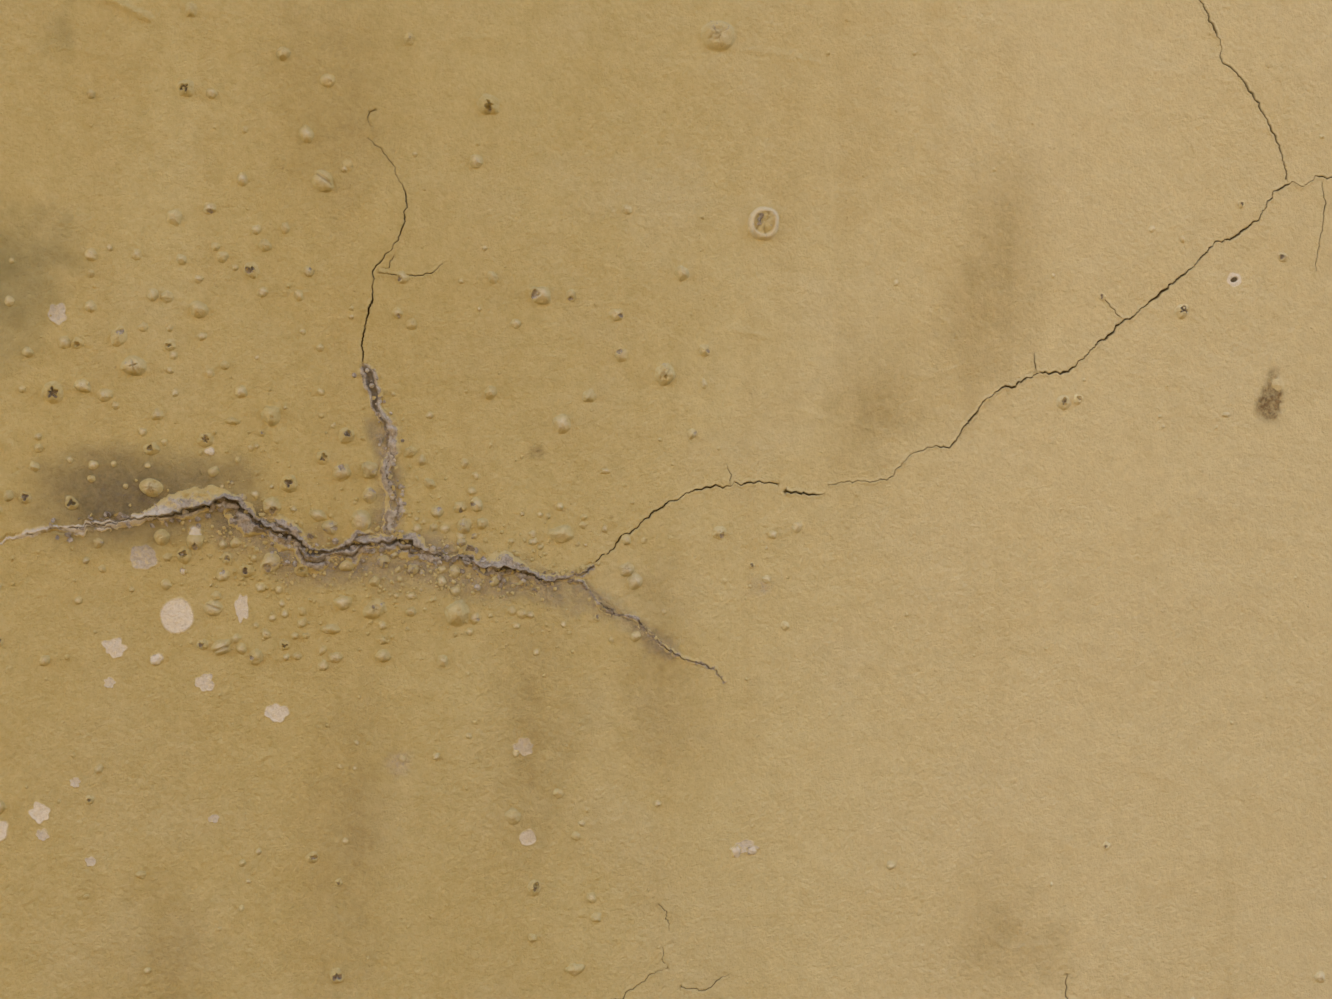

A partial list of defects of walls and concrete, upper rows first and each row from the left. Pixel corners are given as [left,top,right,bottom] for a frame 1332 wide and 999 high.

peeling [128,543,160,571]
crack [0,0,1332,685]